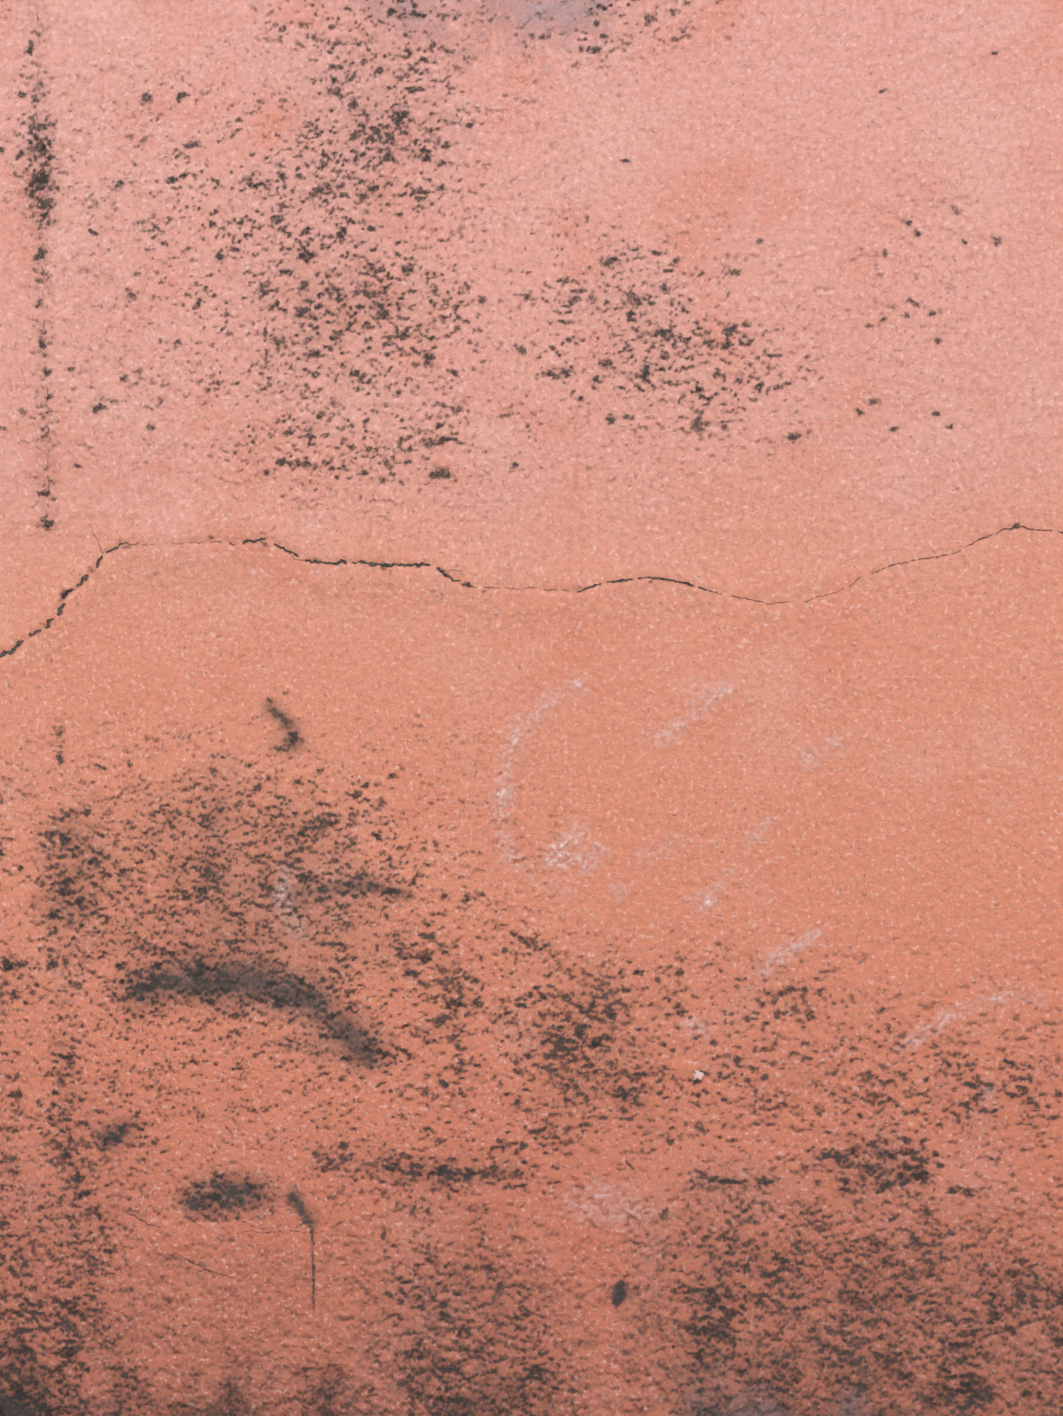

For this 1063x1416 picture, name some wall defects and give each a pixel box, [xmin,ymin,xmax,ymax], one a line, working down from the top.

leakage [515,0,634,57]
leakage [192,0,485,485]
mould [542,240,791,436]
crack [0,535,154,658]
crack [196,523,1063,605]
leakage [0,732,1063,1416]